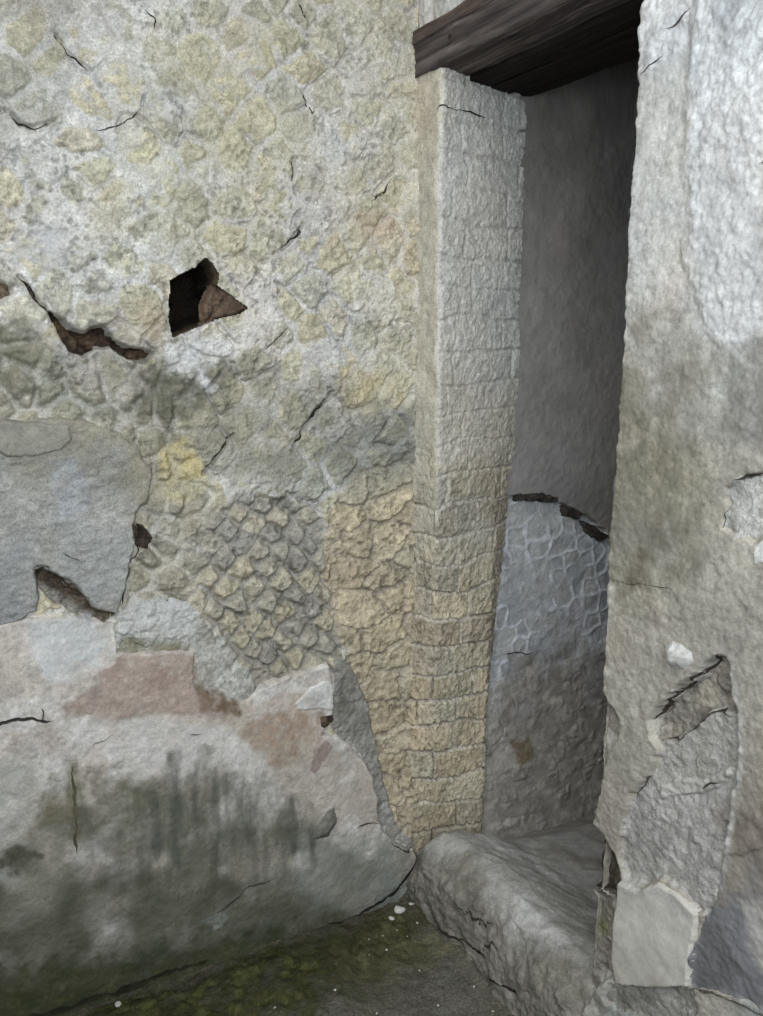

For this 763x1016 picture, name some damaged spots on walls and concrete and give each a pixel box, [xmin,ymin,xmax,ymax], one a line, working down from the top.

spalling [168,258,248,337]
spalling [723,473,763,564]
spalling [482,492,621,838]
crack [0,709,51,726]
spalling [582,654,763,1016]